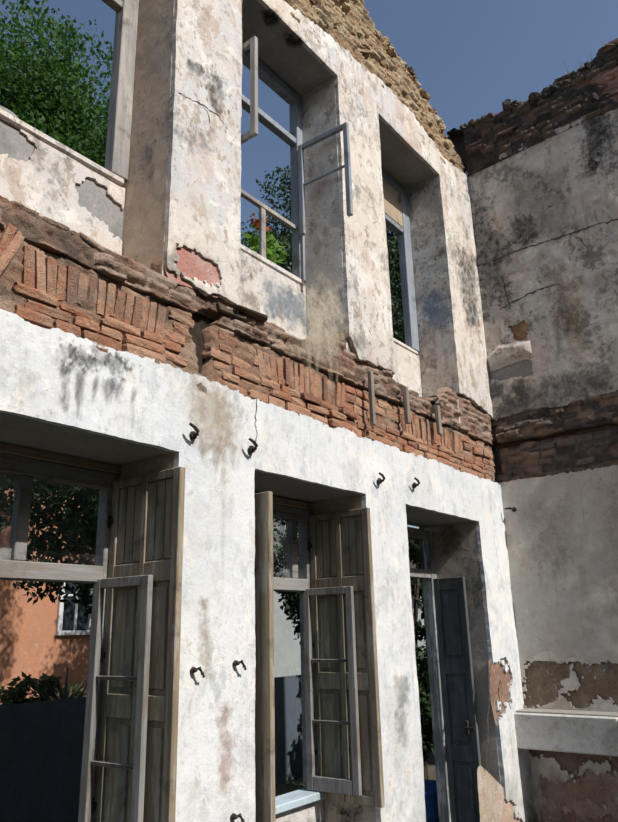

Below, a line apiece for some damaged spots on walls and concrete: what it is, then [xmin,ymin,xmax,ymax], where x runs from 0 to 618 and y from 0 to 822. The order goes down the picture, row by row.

flaking render [0,105,35,162]
flaking render [75,177,124,241]
peeling [165,245,222,298]
crack [477,219,618,310]
damp [69,344,132,405]
peeling [489,658,513,726]
flaking render [522,660,618,709]
flaking render [477,766,521,822]
flaking render [529,749,618,822]